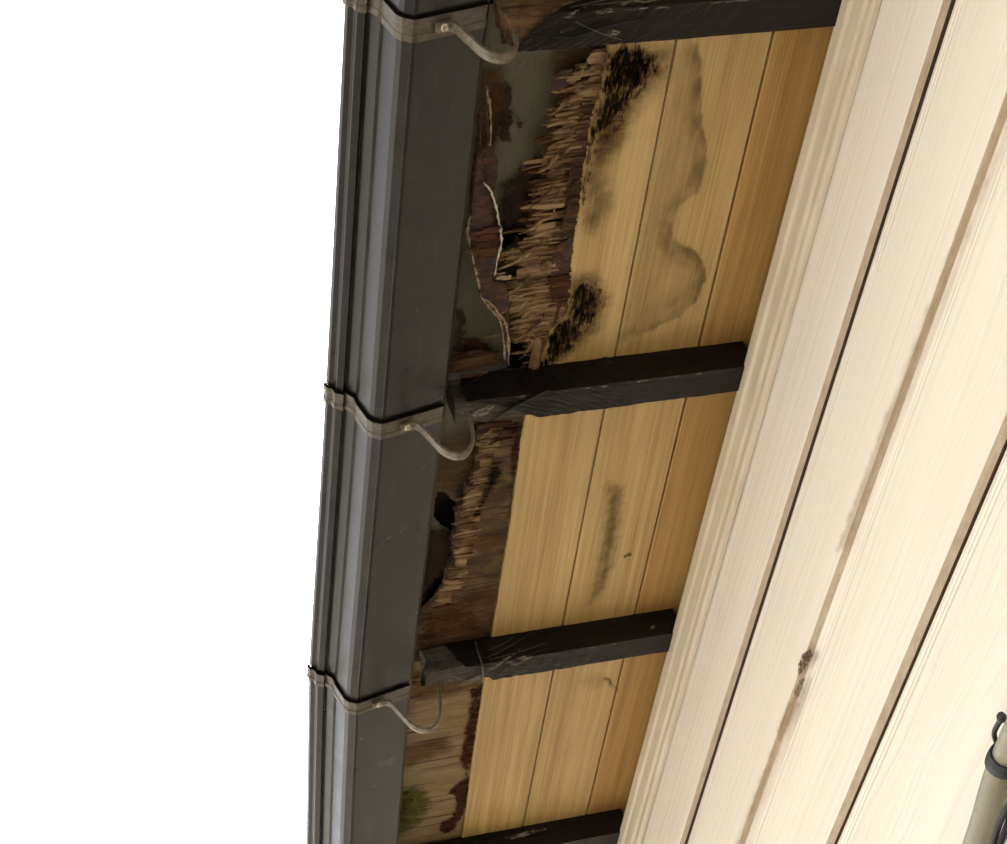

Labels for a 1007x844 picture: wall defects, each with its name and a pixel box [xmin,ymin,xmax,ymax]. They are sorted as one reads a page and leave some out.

water stain [582,43,659,226]
peeling [550,235,574,289]
water stain [598,495,618,590]